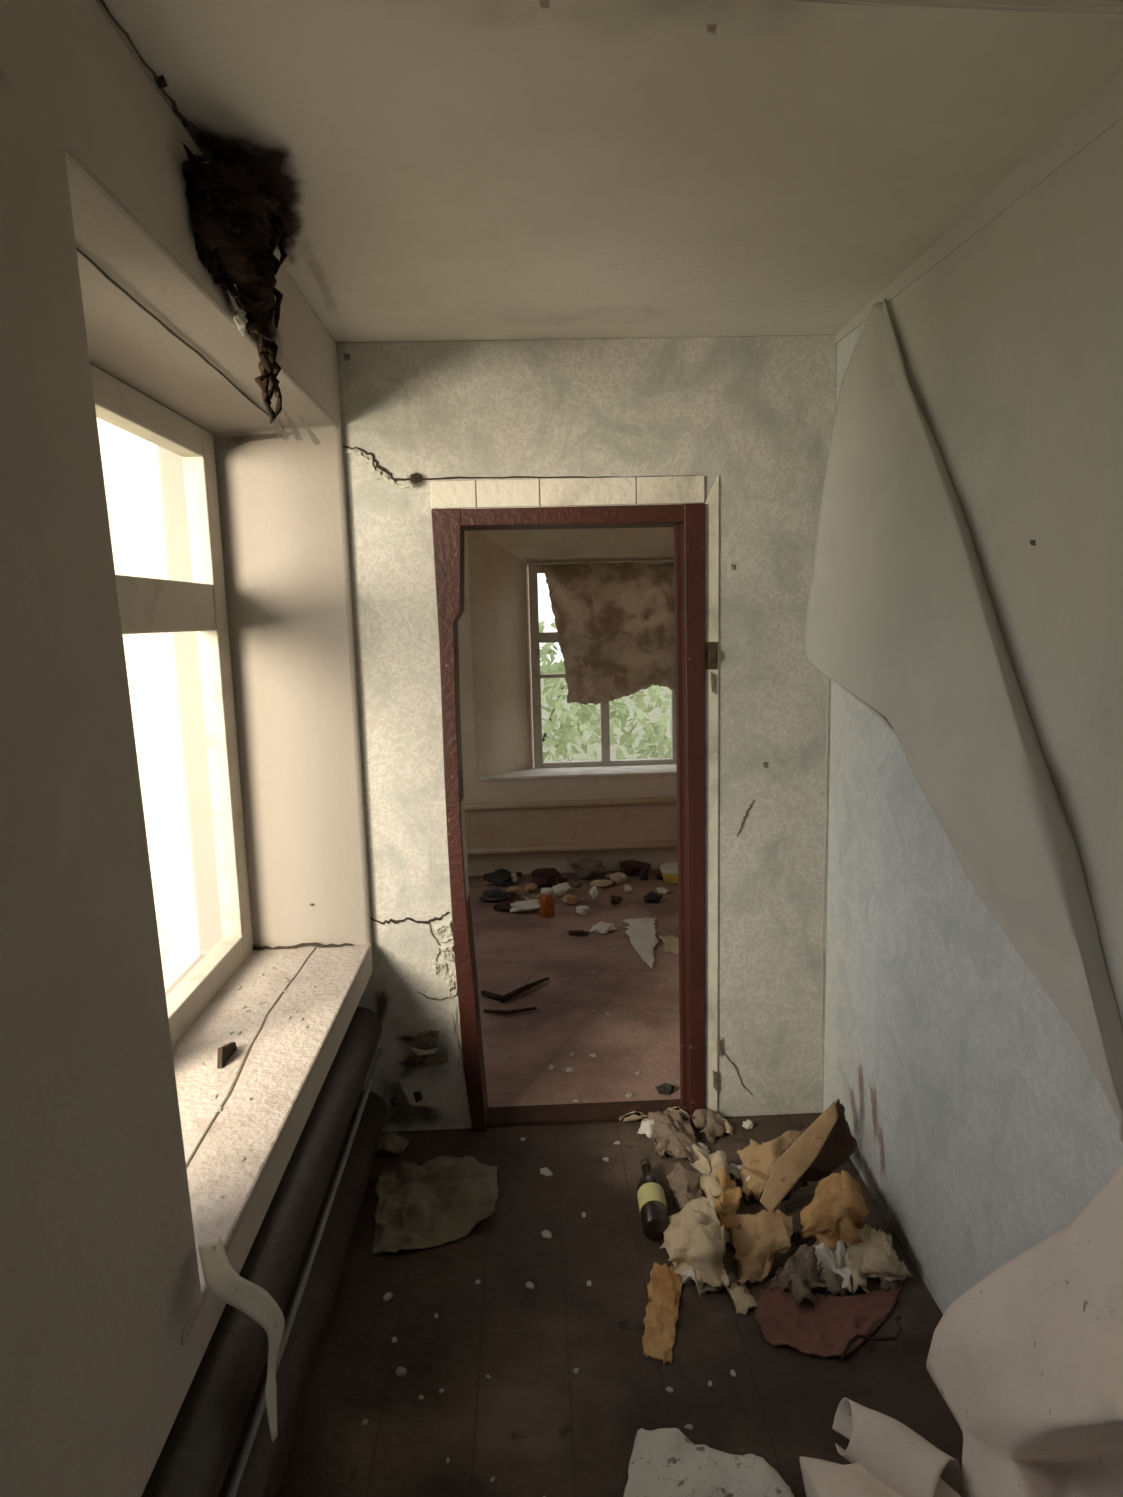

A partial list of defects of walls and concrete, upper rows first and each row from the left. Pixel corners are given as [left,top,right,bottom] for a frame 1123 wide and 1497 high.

crack [343,446,697,489]
crack [186,912,450,1167]